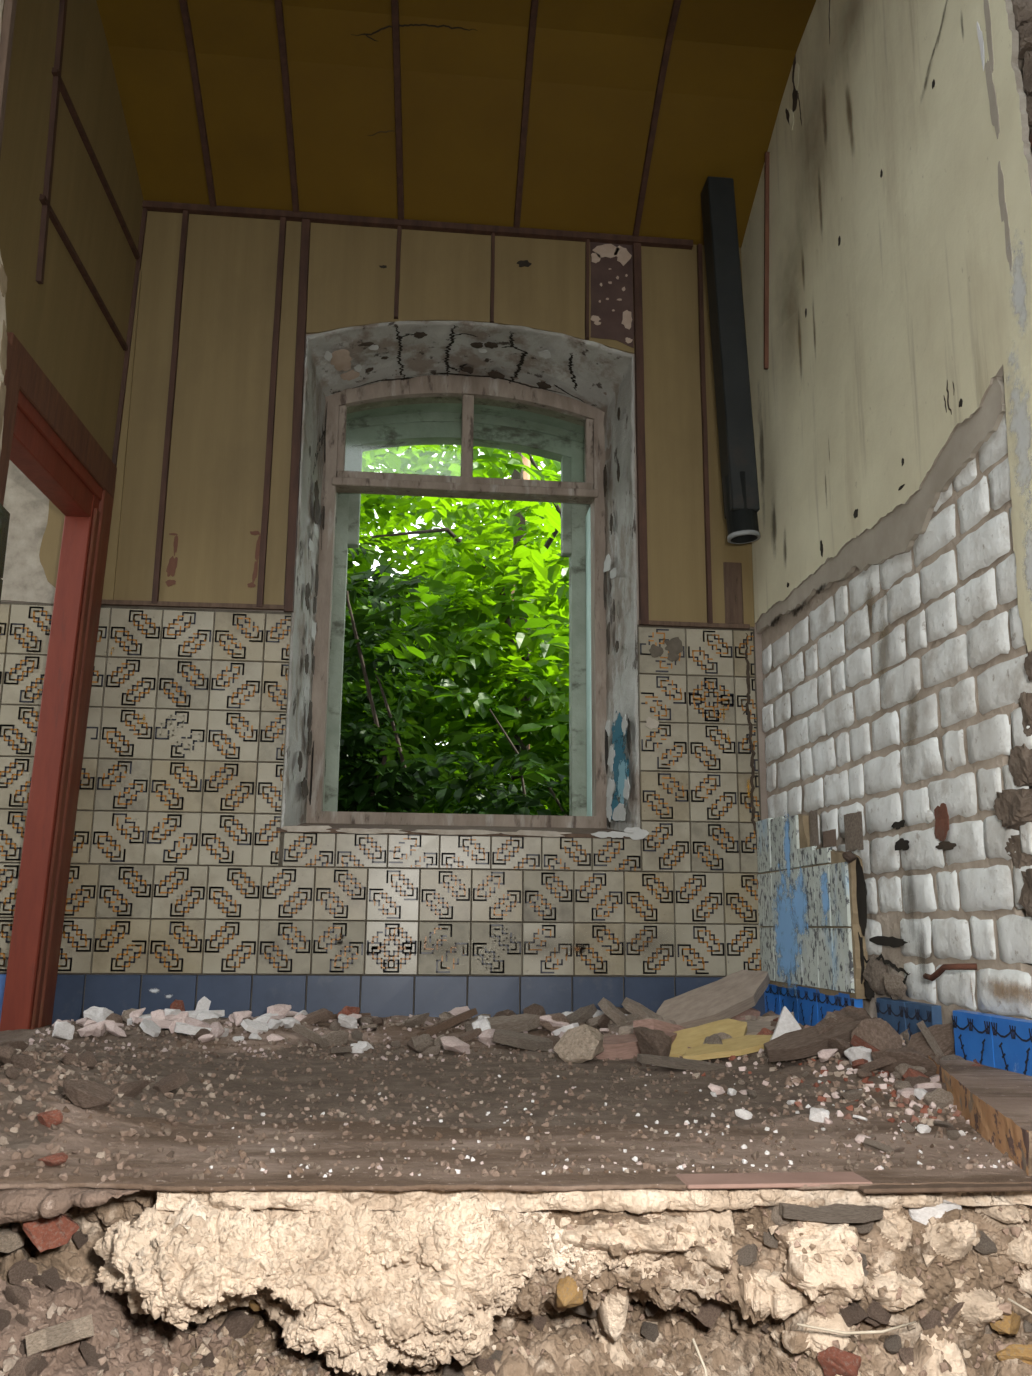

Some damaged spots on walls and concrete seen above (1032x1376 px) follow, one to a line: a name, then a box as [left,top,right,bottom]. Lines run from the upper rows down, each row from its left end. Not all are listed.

crack [351,24,477,41]
flaking render [785,55,799,131]
flaking render [977,0,1000,139]
spalling [1011,0,1032,148]
flaking render [998,161,1012,272]
peeling [590,242,634,348]
crack [313,325,585,550]
peeling [591,711,649,840]
flaking render [762,413,1032,1018]